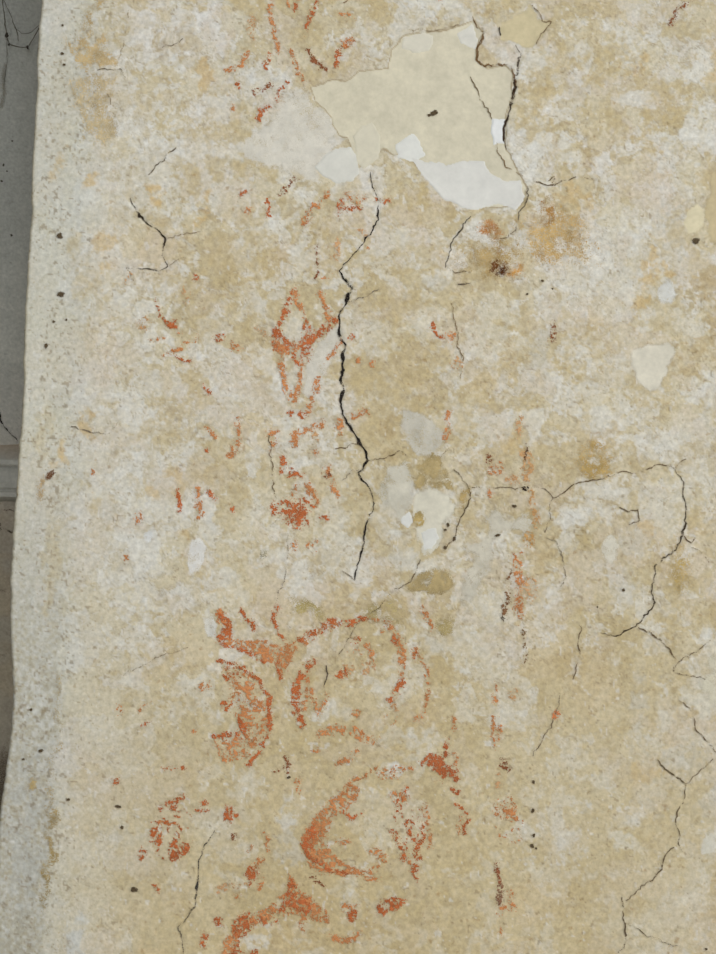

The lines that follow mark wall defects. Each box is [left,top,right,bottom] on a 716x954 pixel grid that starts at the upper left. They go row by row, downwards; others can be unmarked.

flaking render [310,20,527,210]
crack [335,172,406,581]
peeling [375,409,456,556]
crack [440,448,517,548]
crack [324,563,420,685]
crack [533,459,709,755]
crack [618,701,716,953]